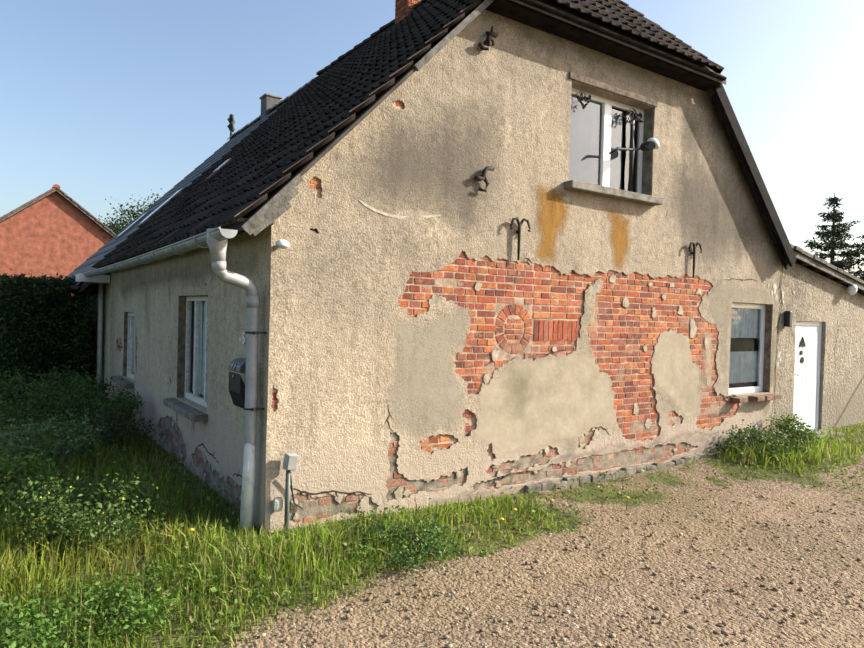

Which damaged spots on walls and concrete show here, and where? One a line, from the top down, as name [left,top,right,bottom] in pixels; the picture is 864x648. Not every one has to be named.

spalling [307,177,322,198]
corrosion [539,190,567,258]
corrosion [612,214,628,265]
spalling [289,251,739,524]
spalling [158,416,242,510]